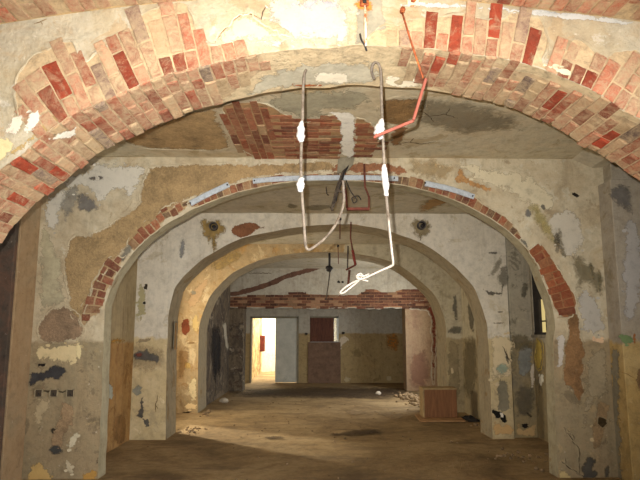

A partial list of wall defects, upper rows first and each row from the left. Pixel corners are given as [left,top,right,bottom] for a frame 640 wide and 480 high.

spalling [0,0,584,390]
water stain [416,101,512,133]
water stain [211,326,221,386]
spalling [529,243,587,403]